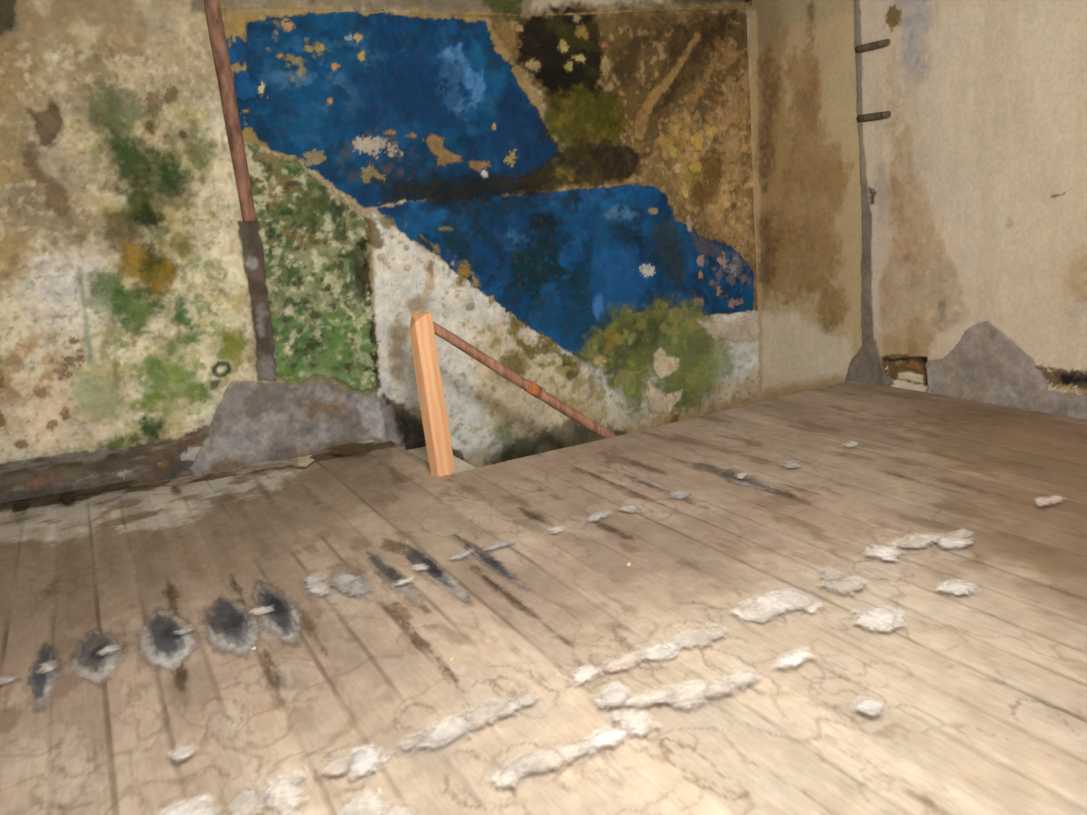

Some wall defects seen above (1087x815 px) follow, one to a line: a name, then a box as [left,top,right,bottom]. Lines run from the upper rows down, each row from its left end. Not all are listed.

peeling [226,10,760,356]
leakage [762,51,846,328]
flaking render [882,354,928,386]